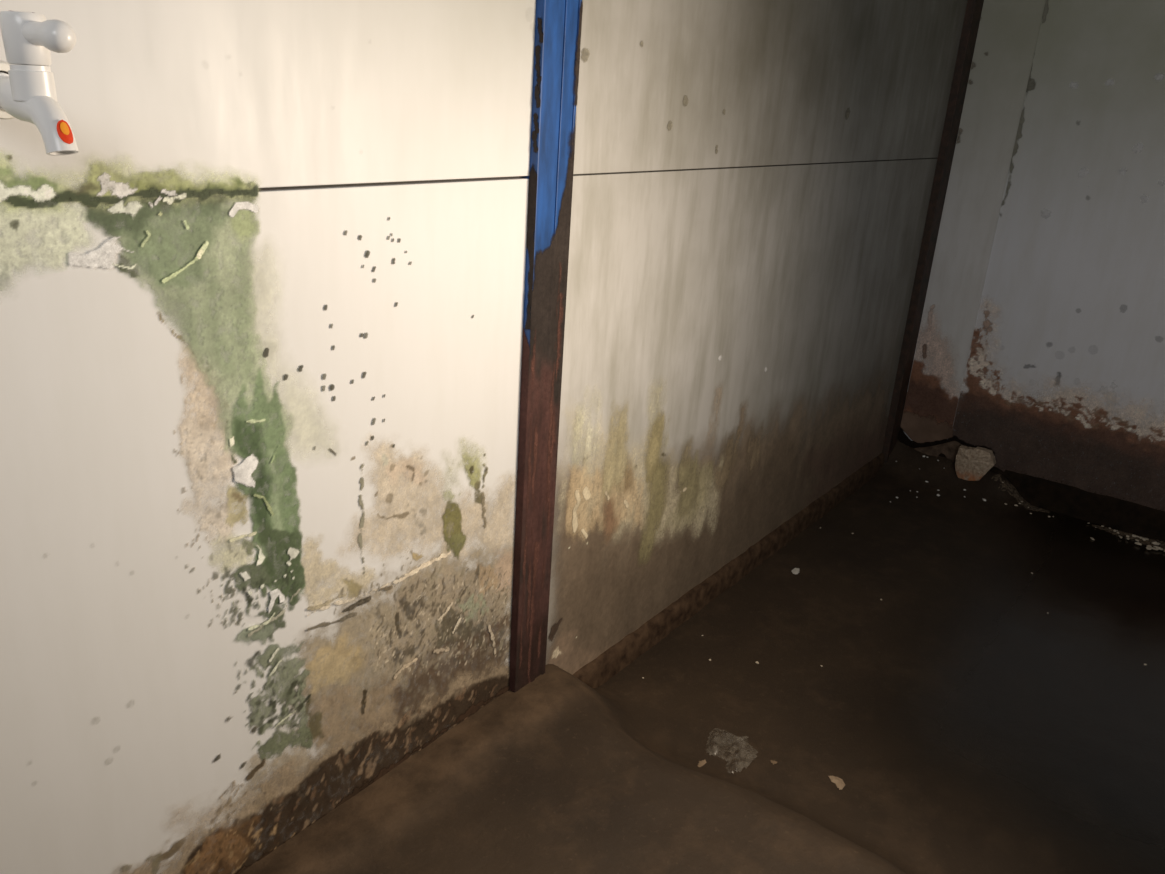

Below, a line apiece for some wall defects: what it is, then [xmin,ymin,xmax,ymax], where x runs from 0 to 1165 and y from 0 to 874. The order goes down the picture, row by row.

peeling [0,182,136,290]
peeling [97,173,186,216]
peeling [229,202,259,217]
damp [258,339,277,362]
corrosion [509,1,583,692]
damp [159,313,252,579]
peeling [233,454,258,487]
damp [603,387,698,560]
corrosion [904,302,1165,511]
peeling [239,545,299,613]
damp [232,418,515,817]
damp [549,618,562,658]